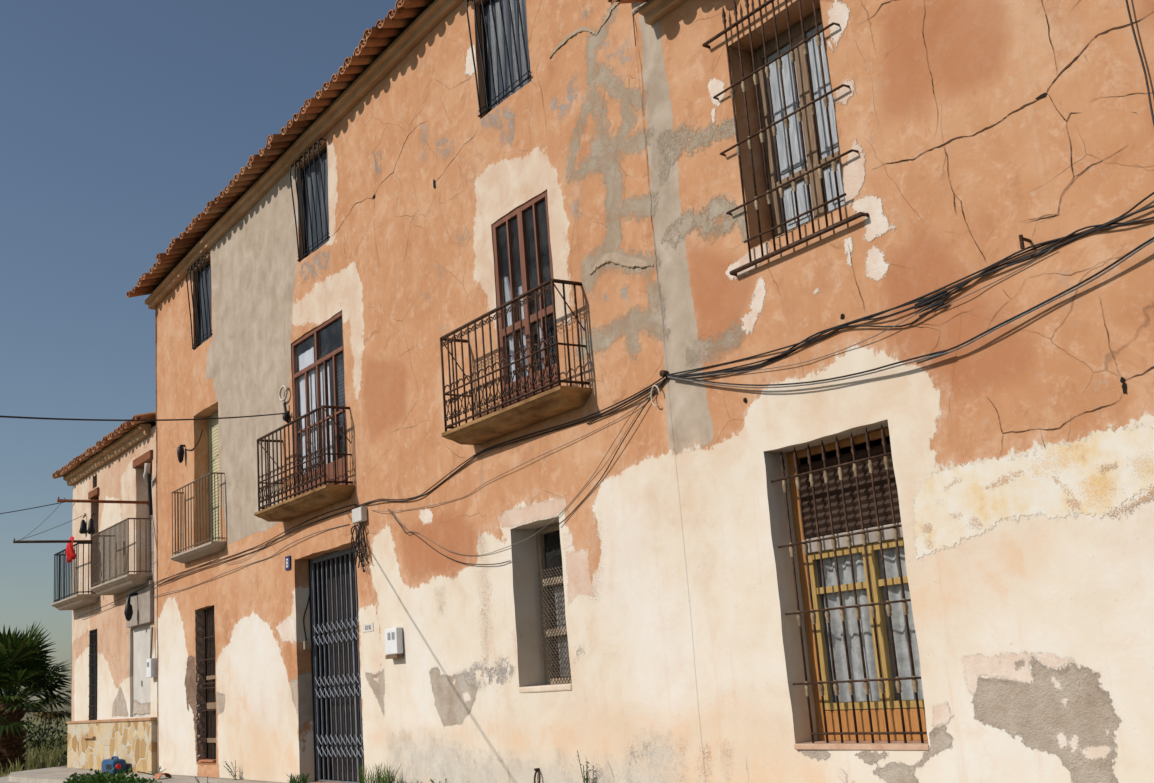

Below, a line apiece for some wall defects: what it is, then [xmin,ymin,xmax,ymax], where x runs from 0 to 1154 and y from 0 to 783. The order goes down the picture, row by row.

peeling [826,0,850,52]
peeling [707,77,726,123]
crack [846,0,1154,259]
peeling [842,138,898,281]
crack [986,297,1154,456]
peeling [912,422,1154,560]
peeling [276,616,296,642]
peeling [184,655,197,763]
peeling [365,668,385,714]
peeling [429,667,478,727]
peeling [854,702,953,783]
peeling [961,651,1122,783]